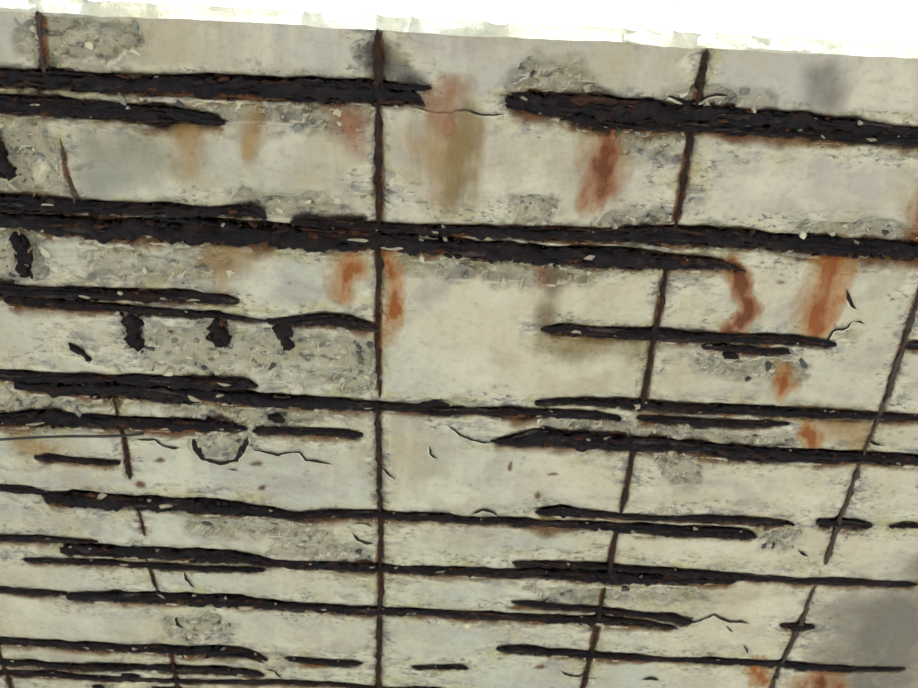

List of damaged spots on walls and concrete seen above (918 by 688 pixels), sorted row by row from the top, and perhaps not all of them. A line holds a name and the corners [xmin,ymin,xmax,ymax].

corrosion [0,64,432,158]
spalling [176,99,384,224]
crack [416,107,505,118]
spalling [595,121,696,229]
corrosion [505,89,918,208]
corrosion [0,192,918,469]
spalling [640,269,670,404]
crack [826,289,864,342]
crack [136,437,332,471]
spalling [144,248,385,688]
spalling [824,291,918,566]
corrosion [496,644,906,688]